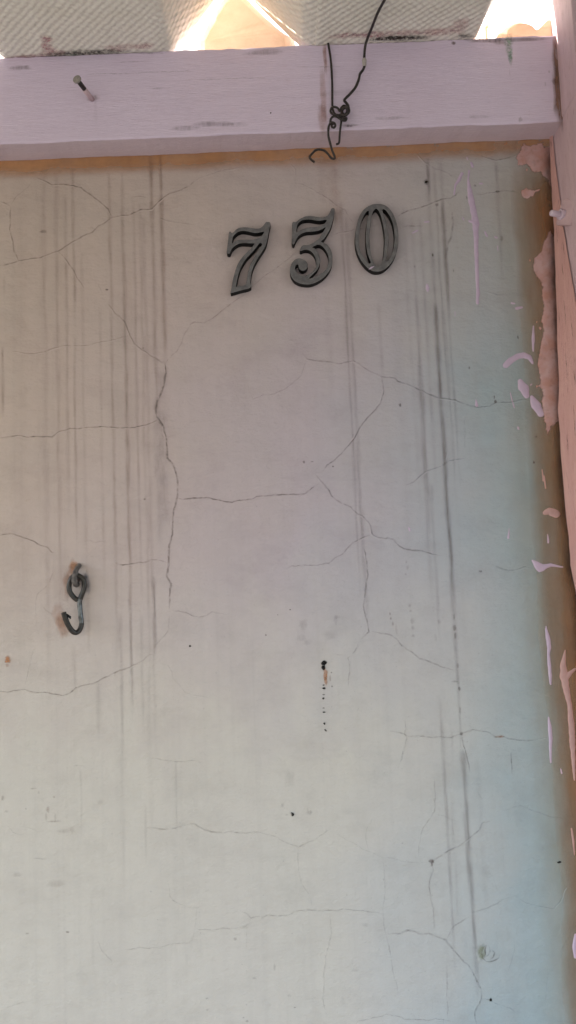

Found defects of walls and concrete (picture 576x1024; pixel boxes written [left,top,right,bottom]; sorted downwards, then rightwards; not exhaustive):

peeling [516,143,551,199]
peeling [529,231,559,433]
crack [0,363,453,698]
crack [357,820,516,1024]